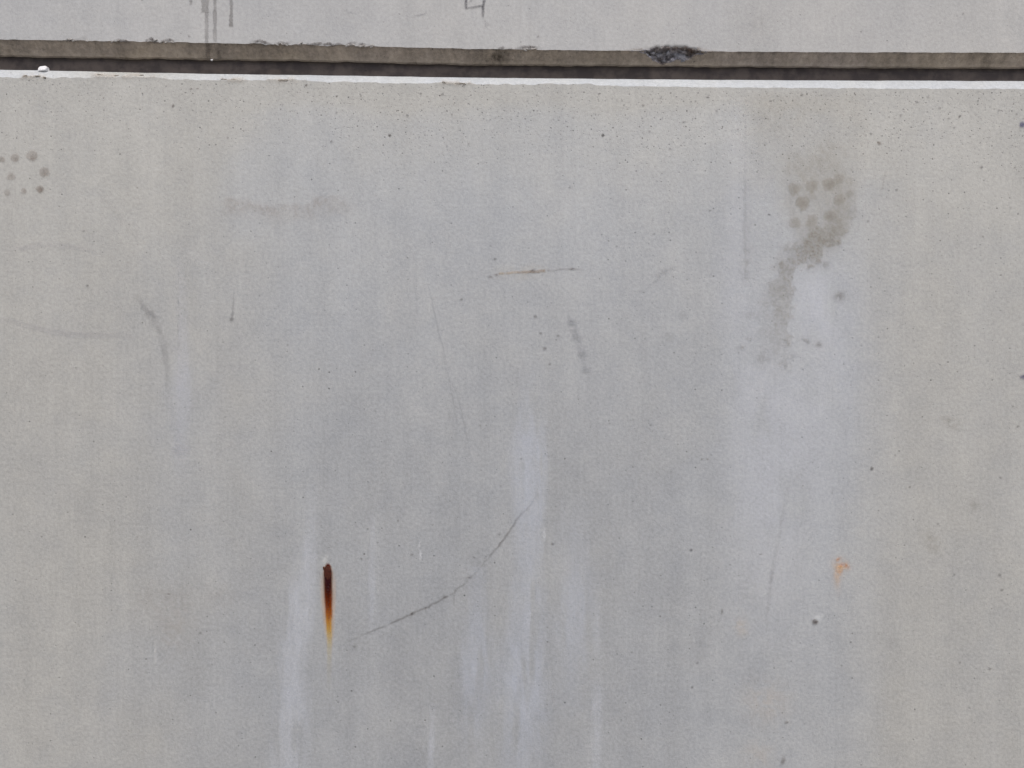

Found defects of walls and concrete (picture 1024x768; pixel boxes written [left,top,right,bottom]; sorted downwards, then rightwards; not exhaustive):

spalling [640,46,706,65]
rust [323,564,332,634]